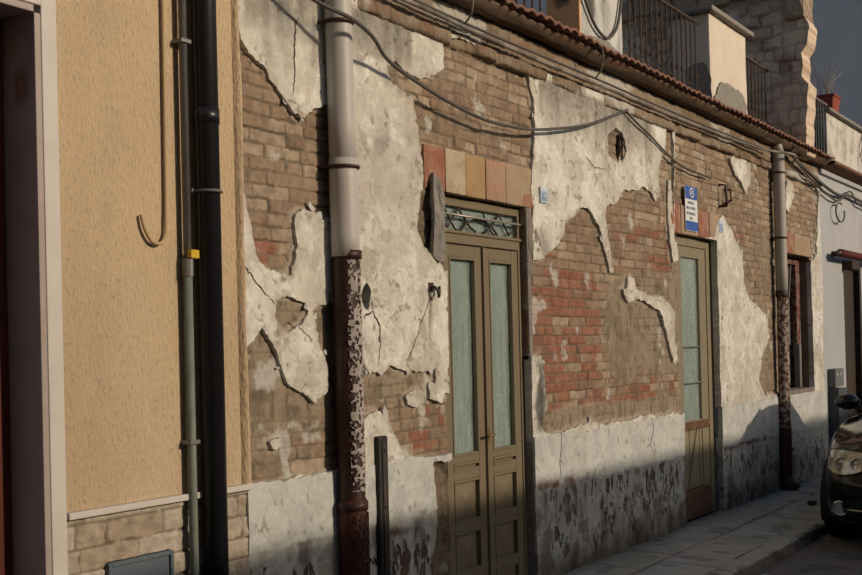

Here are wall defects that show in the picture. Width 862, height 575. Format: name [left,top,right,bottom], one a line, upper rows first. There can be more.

crack [284,12,299,93]
spalling [592,36,617,51]
spalling [239,44,330,282]
spalling [387,46,535,266]
spalling [522,129,779,434]
spalling [785,176,819,263]
spalling [247,297,338,483]
spalling [347,260,452,575]
peeling [550,488,576,557]
peeling [594,463,678,545]